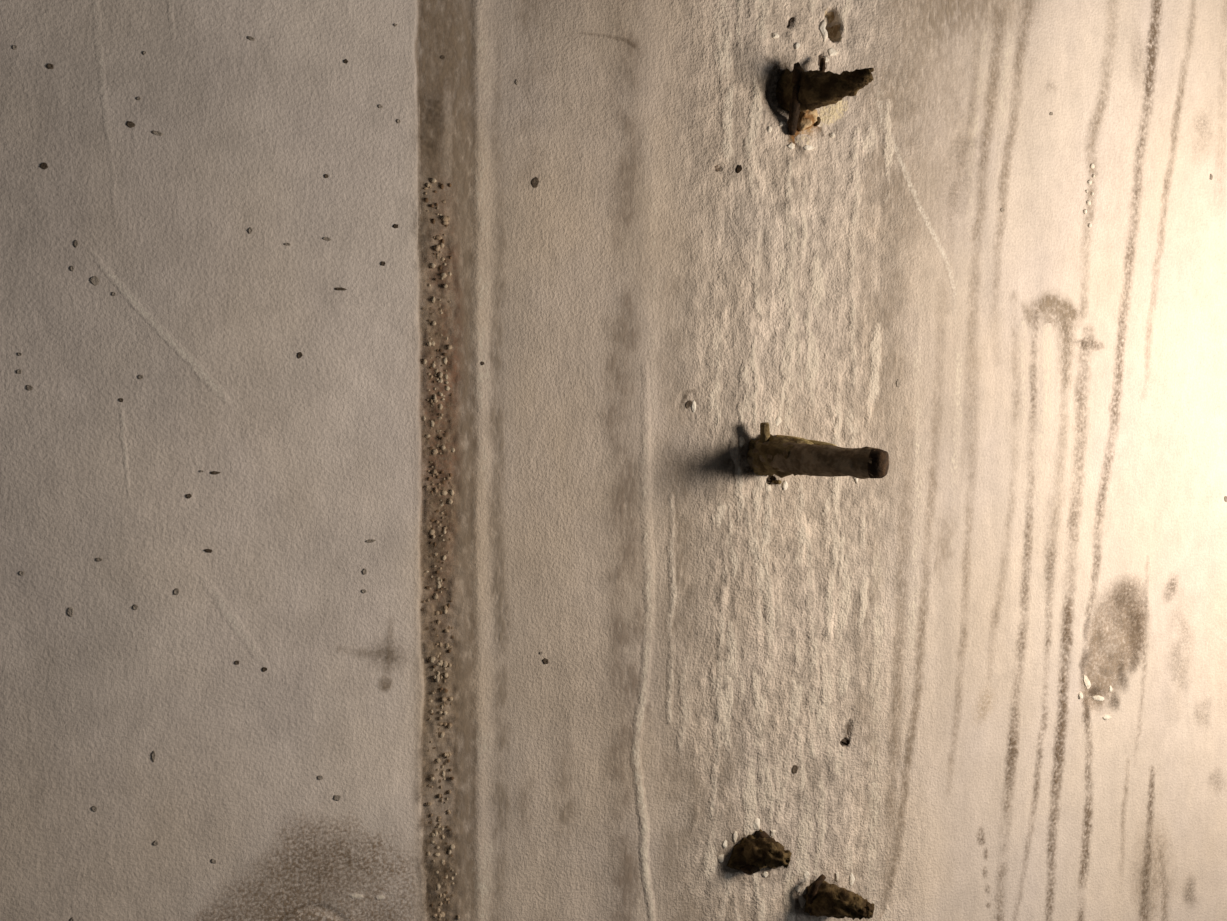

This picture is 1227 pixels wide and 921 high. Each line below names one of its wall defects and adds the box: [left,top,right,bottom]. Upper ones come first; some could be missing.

water stain [1146,0,1161,110]
water stain [214,826,411,921]
rust [726,829,776,875]